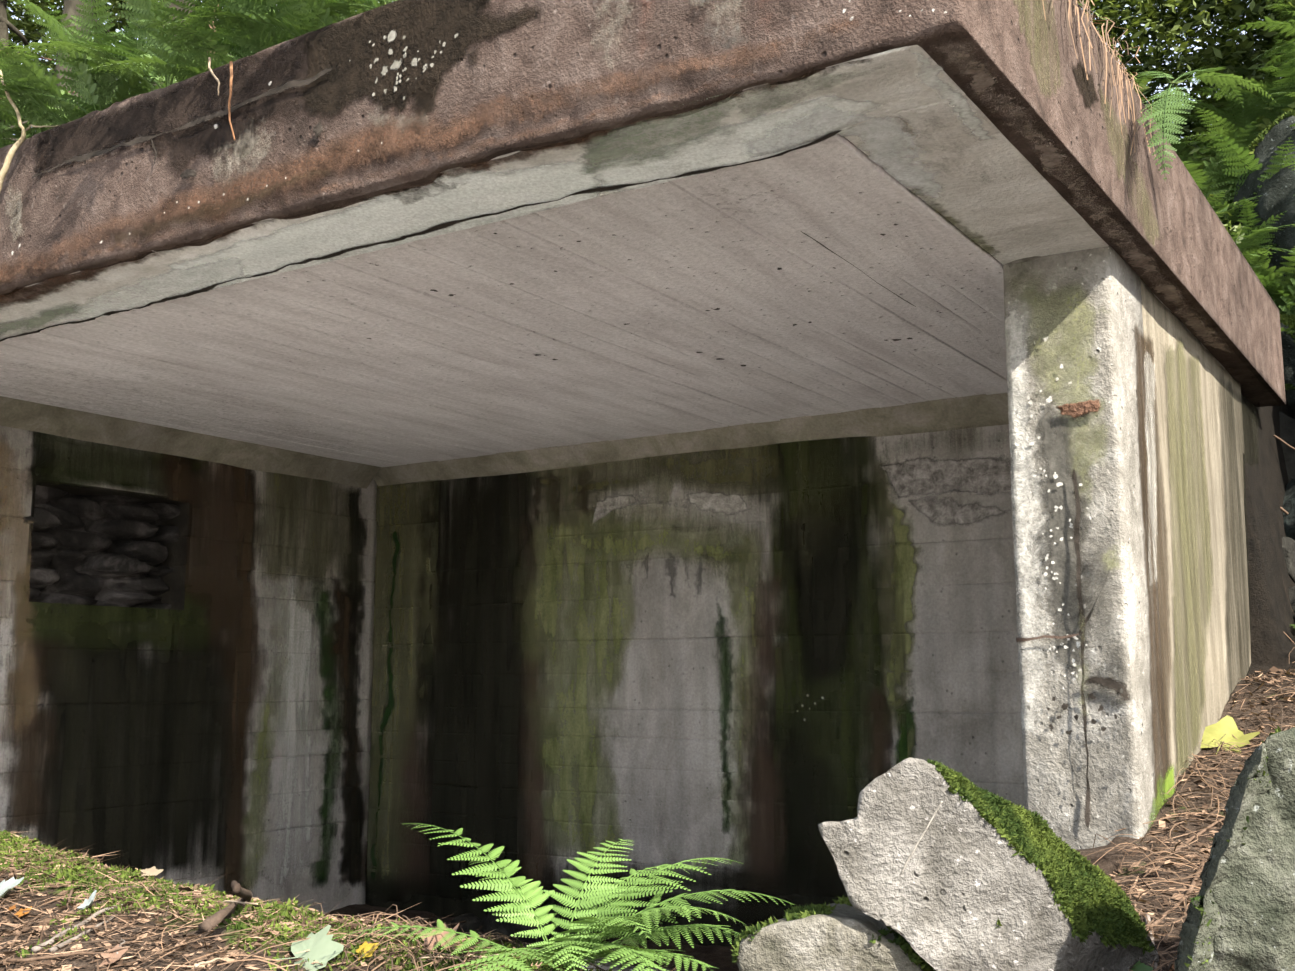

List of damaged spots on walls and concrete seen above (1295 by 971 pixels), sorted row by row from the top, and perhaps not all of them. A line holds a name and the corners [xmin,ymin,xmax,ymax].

damp [36,0,540,178]
crack [0,130,842,342]
rust [0,30,870,310]
spalling [881,458,1012,525]
damp [4,431,919,947]
crack [1016,469,1118,828]